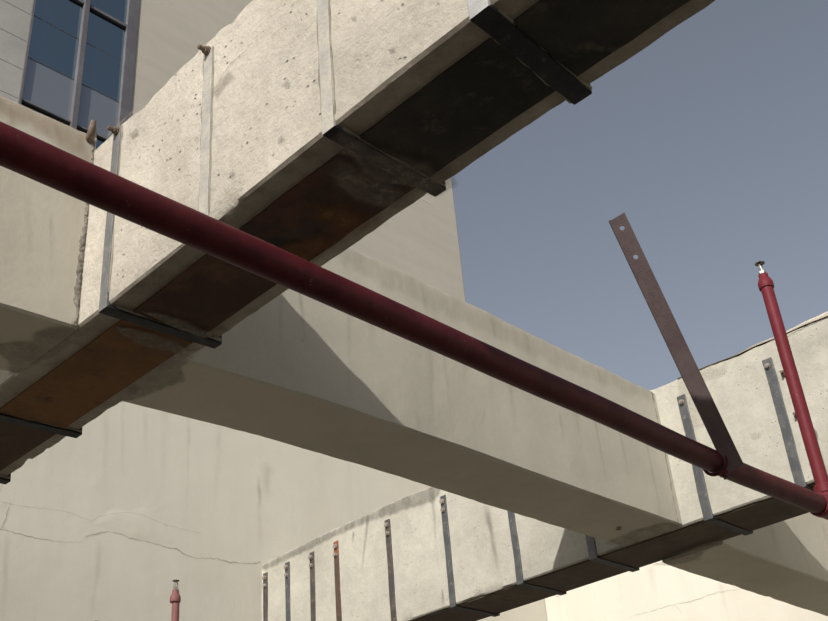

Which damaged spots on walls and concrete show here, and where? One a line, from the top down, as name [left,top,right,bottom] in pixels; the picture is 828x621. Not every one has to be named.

spalling [86,120,97,164]
spalling [71,202,89,326]